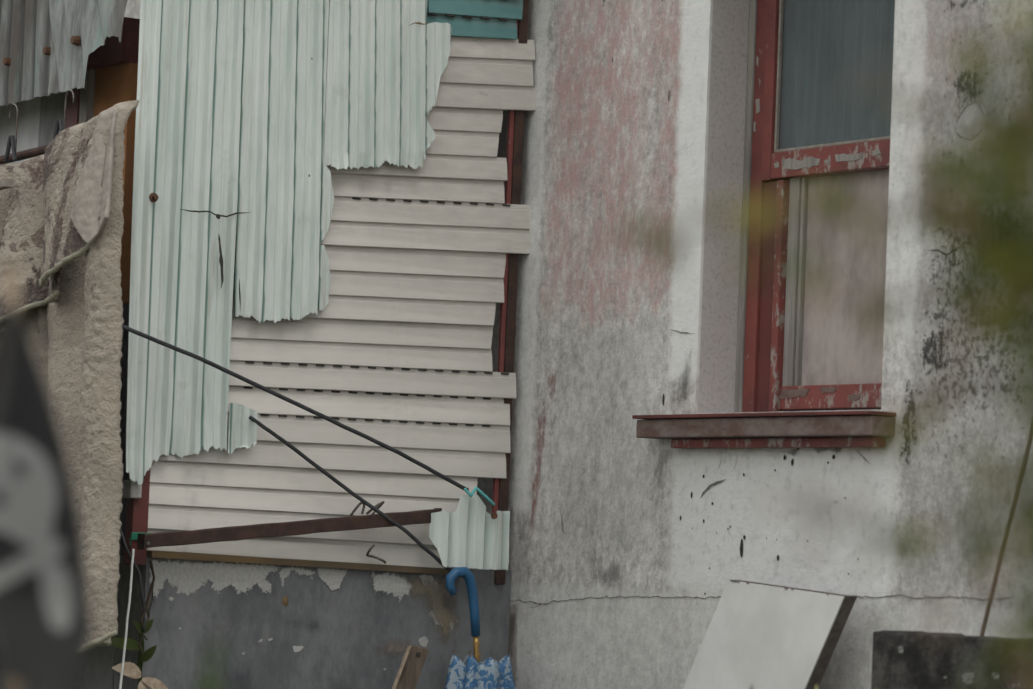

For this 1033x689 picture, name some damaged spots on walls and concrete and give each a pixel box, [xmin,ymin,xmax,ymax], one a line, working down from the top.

peeling [774,150,881,170]
crack [181,209,251,307]
peeling [149,558,347,601]
peeling [371,572,438,602]
crack [510,596,721,608]
crack [851,593,1011,601]